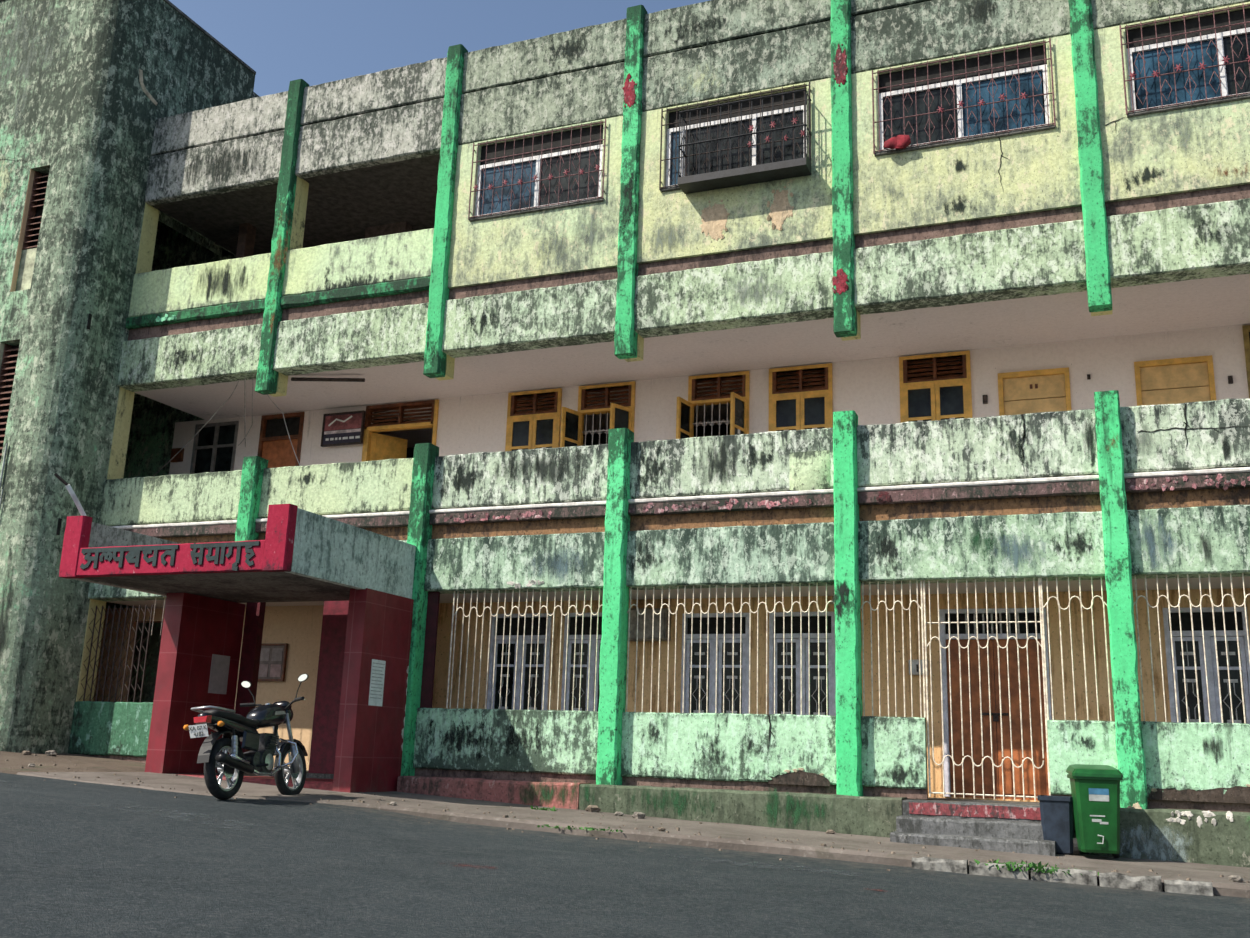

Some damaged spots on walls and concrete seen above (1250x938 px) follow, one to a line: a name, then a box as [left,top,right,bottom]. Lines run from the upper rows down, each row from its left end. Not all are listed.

leakage [187,148,260,185]
crack [998,137,1008,188]
leakage [1125,167,1164,191]
spalling [701,200,730,241]
spalling [767,186,794,231]
leakage [943,196,977,215]
leakage [200,267,245,300]
leakage [166,344,203,372]
crack [1138,404,1248,451]
peeling [1126,473,1250,492]
leakage [870,536,904,576]
spalling [1127,784,1250,828]